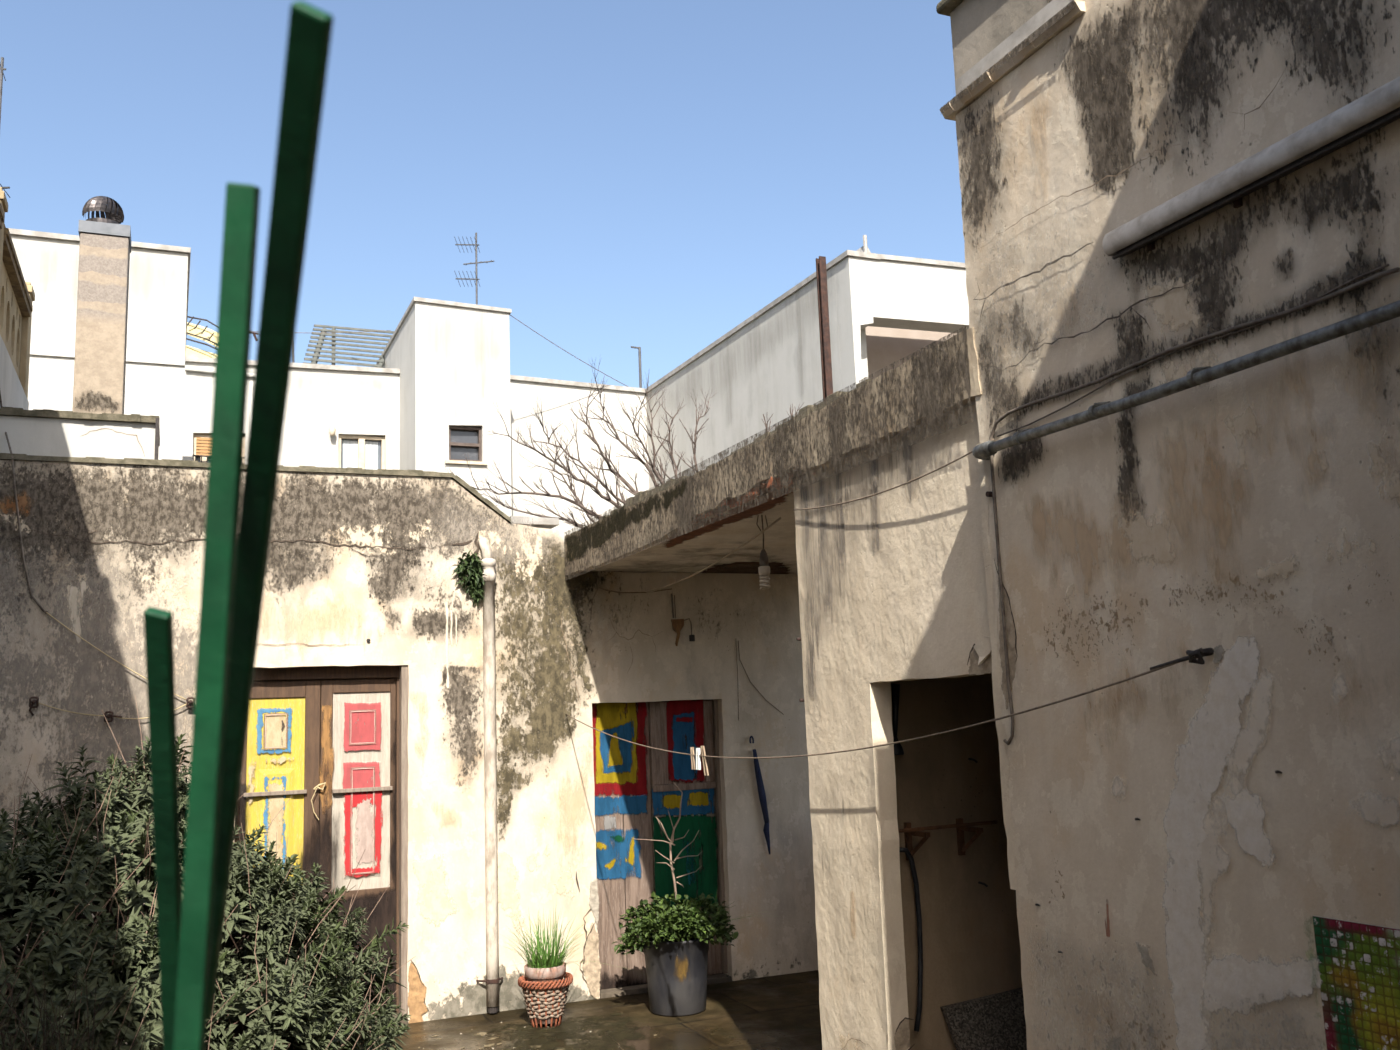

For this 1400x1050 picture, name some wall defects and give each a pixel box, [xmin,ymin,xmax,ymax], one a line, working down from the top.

crack [980,144,1181,248]
crack [973,242,1093,318]
crack [984,278,1198,371]
leakage [264,0,1400,846]
leakage [0,460,209,819]
spalling [408,959,429,1024]